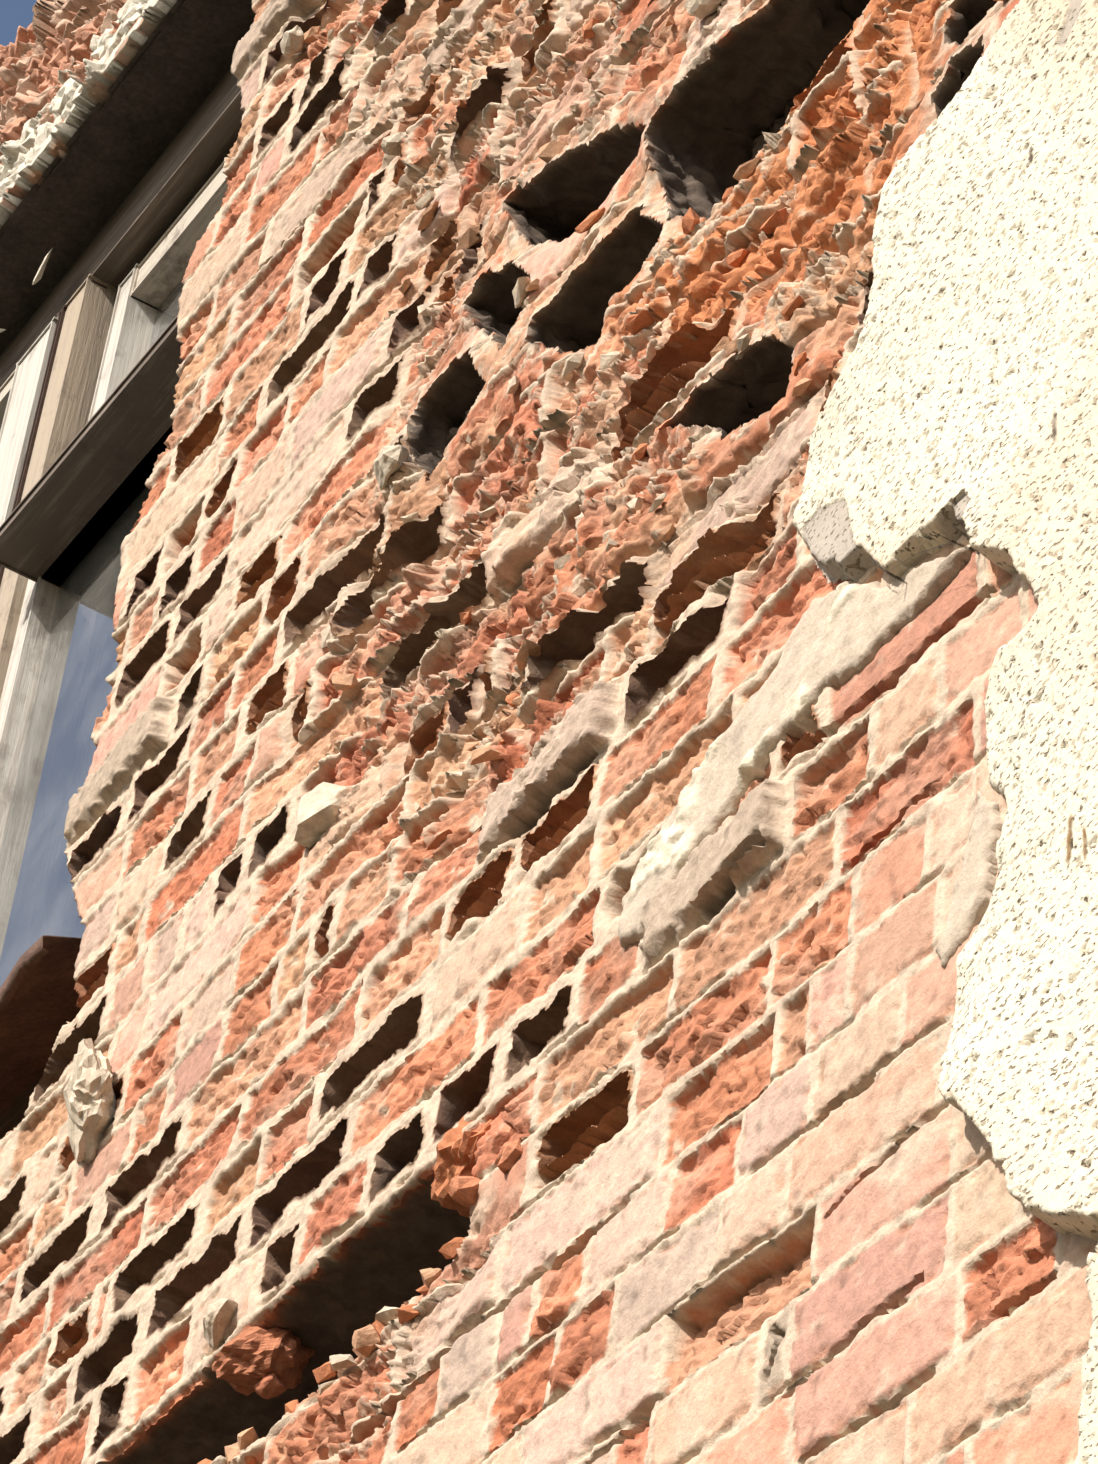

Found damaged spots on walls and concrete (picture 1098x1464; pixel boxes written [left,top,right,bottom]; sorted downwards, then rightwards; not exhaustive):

spalling [159,498,236,640]
spalling [68,806,121,876]
spalling [115,621,170,704]
spalling [121,675,235,879]
spalling [236,0,1098,1464]
spalling [34,946,112,1101]
spalling [100,1012,183,1231]
spalling [144,980,363,1240]
spalling [0,1197,147,1377]
spalling [114,1206,196,1312]
spalling [147,1215,241,1336]
spalling [0,1314,138,1464]